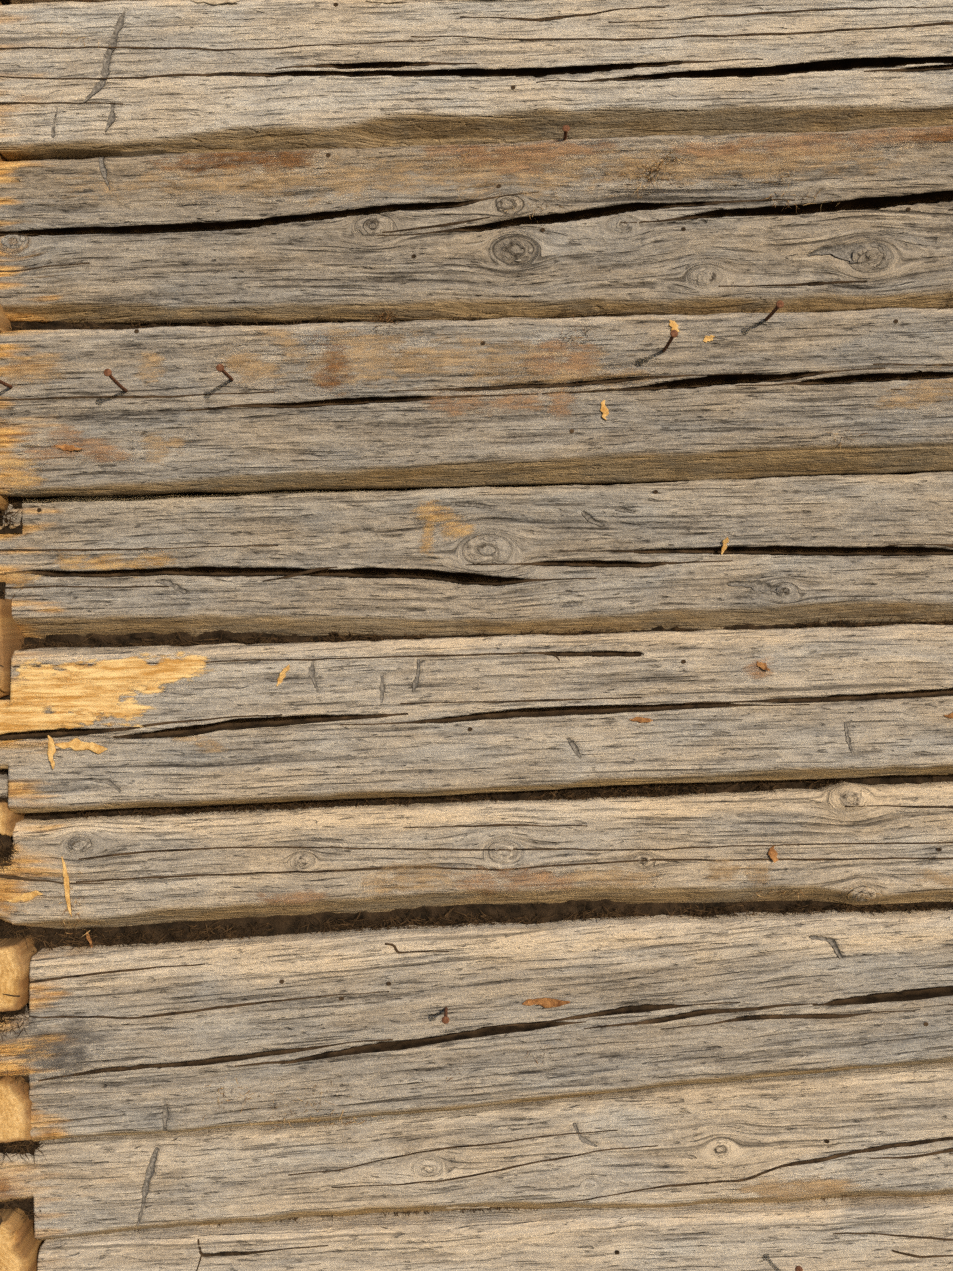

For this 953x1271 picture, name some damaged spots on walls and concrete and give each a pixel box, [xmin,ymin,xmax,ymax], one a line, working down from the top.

crack [0,6,953,104]
crack [0,190,953,272]
crack [0,363,953,411]
crack [0,544,953,589]
crack [0,661,96,669]
crack [205,651,644,663]
spalling [0,652,208,743]
crack [0,688,953,740]
crack [38,986,953,1082]